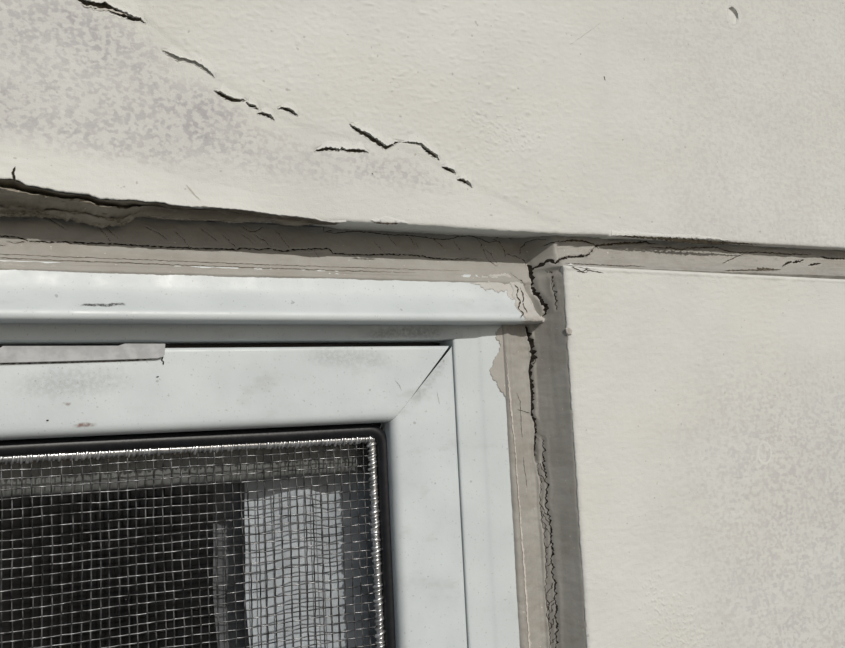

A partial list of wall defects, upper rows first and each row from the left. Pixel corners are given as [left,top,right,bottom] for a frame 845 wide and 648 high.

peeling [78,0,147,24]
peeling [162,46,299,121]
peeling [314,122,473,188]
peeling [470,273,514,300]
crack [0,218,845,648]